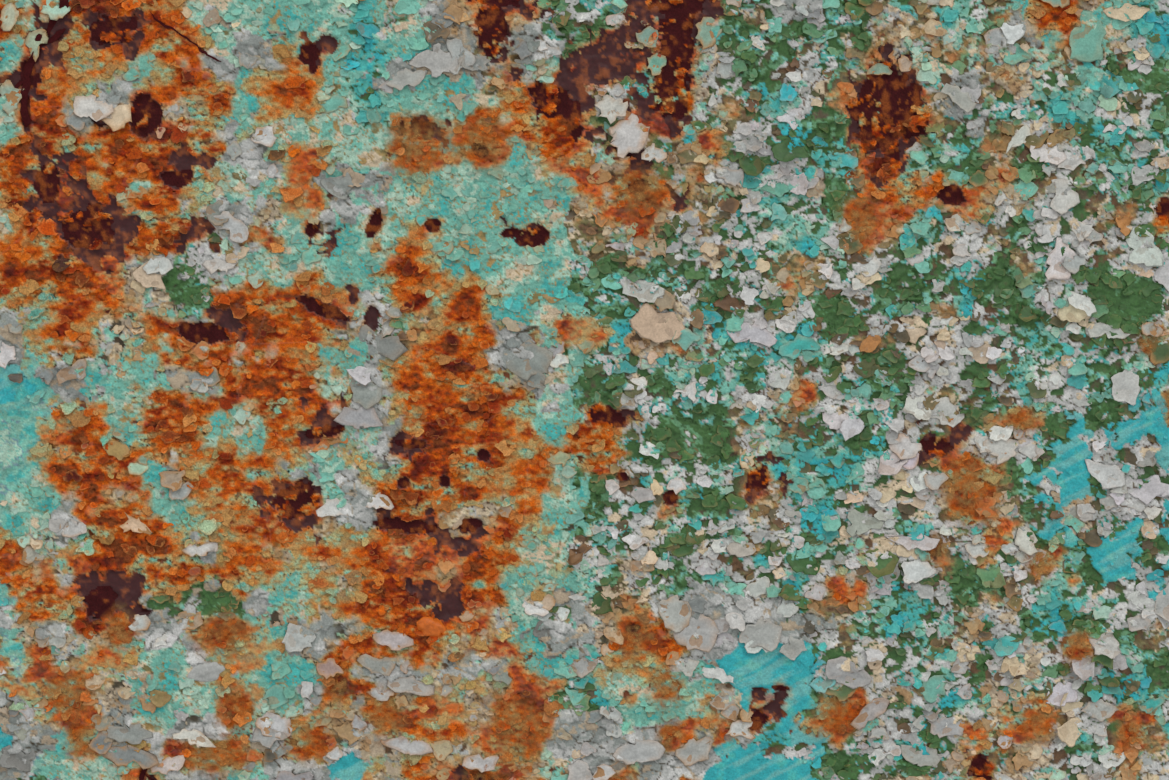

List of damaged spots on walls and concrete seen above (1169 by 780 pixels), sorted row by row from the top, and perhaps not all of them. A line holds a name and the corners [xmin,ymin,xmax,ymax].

peeling [55,90,143,132]
corrosion [843,170,944,254]
corrosion [0,0,573,780]
peeling [301,0,1169,780]
corrosion [1010,413,1035,429]
corrosion [945,451,1004,524]
peeling [0,598,108,673]
peeling [128,593,177,648]
corrosion [593,610,694,697]
peeling [0,692,62,780]
peeling [167,708,217,752]
peeling [242,711,314,780]